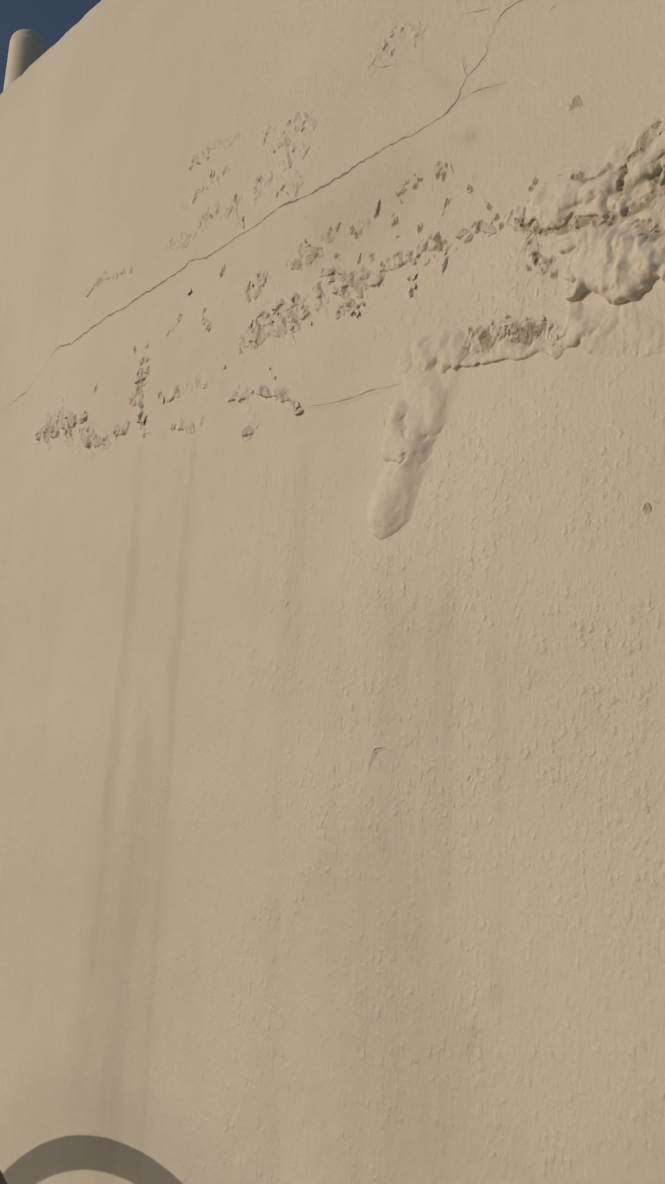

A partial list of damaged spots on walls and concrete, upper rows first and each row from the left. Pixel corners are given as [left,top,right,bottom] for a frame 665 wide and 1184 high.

peeling [157,102,318,259]
crack [0,0,556,412]
peeling [33,161,568,463]